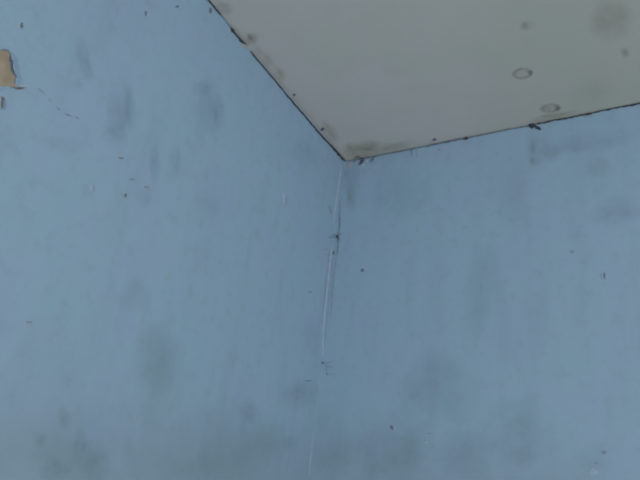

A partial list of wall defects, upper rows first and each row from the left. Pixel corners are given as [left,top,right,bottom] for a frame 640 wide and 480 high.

peeling [0,46,26,110]
crack [208,0,640,477]